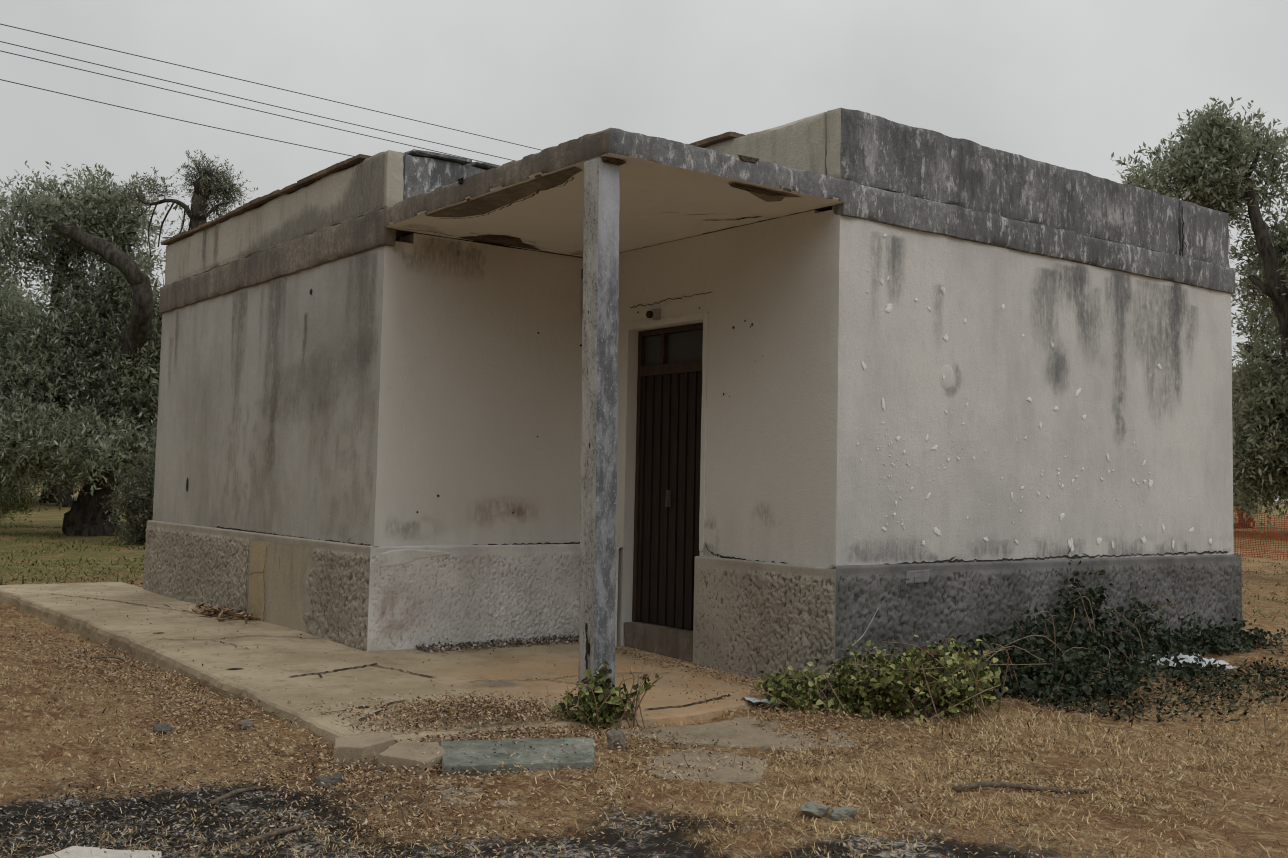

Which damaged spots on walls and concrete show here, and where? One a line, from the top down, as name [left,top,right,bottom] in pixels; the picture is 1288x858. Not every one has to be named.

spalling [426,167,583,251]
spalling [728,182,799,202]